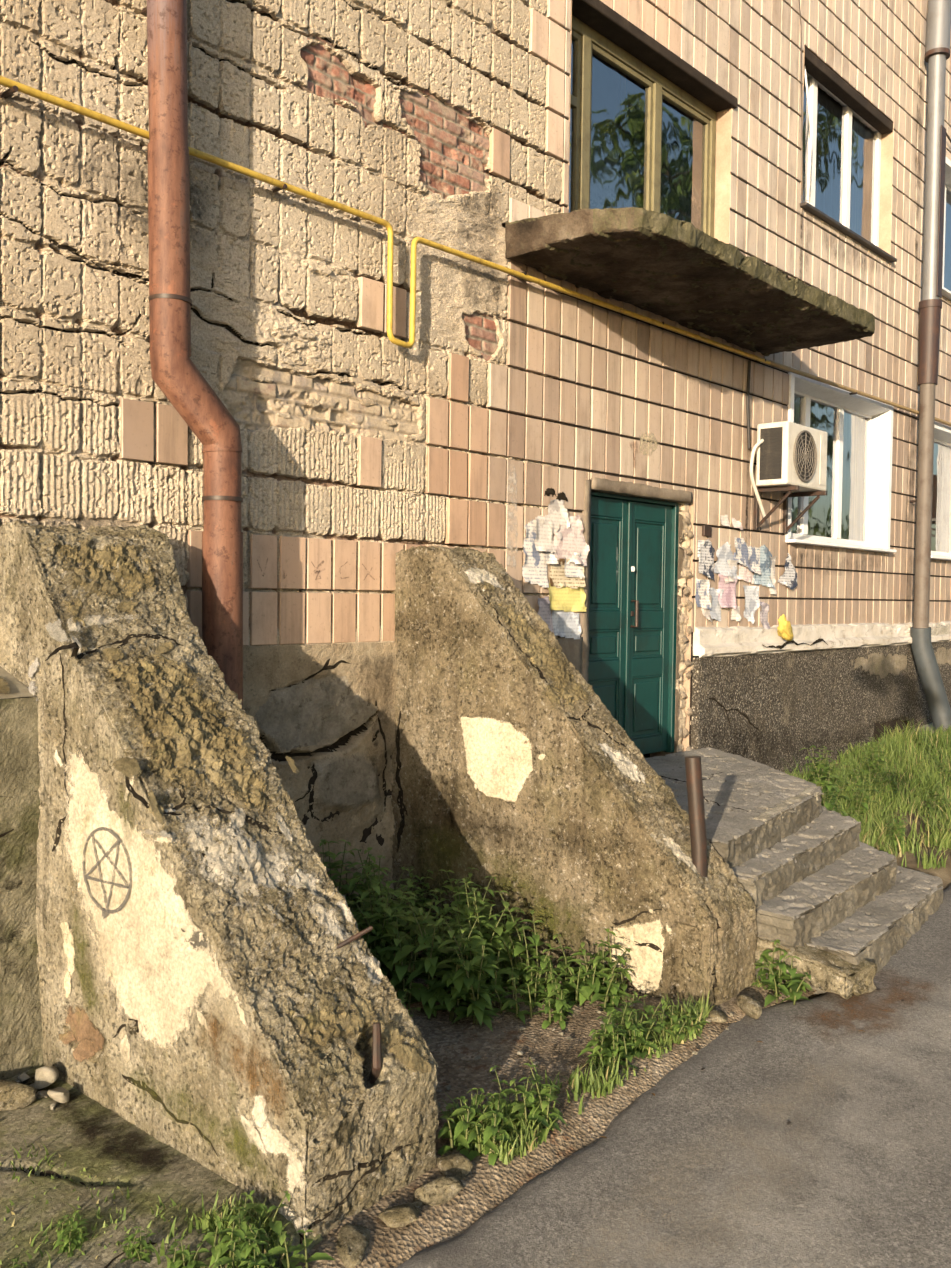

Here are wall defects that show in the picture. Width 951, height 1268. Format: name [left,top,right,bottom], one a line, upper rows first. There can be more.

spalling [300,35,492,199]
crack [0,214,149,284]
crack [0,389,119,407]
crack [1,317,135,340]
crack [190,277,272,347]
spalling [216,308,419,443]
spalling [462,311,499,361]
crack [45,633,191,852]
spalling [256,675,378,773]
peeling [460,716,546,803]
peeling [54,750,384,1062]
crack [122,1074,218,1156]